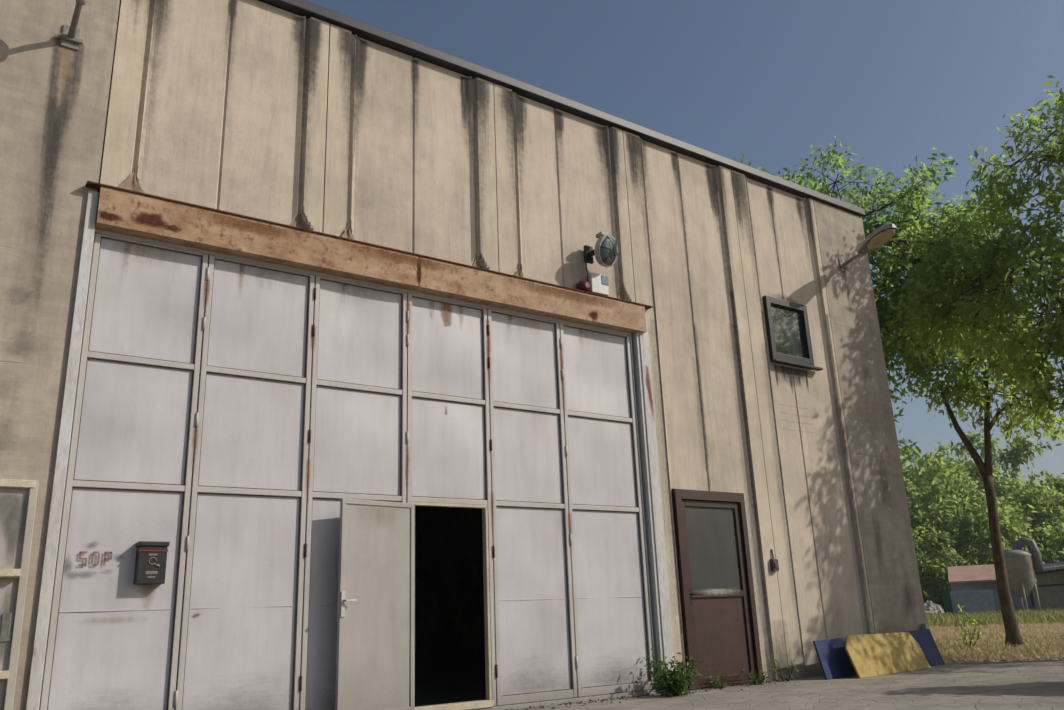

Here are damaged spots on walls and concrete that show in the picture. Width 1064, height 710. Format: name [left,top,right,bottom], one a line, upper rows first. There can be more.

damp [296,17,319,82]
damp [342,31,366,94]
damp [43,39,80,216]
damp [461,76,487,120]
damp [503,89,523,138]
damp [555,110,563,132]
damp [598,126,646,178]
rust [100,212,120,221]
rust [135,213,181,232]
damp [707,165,746,220]
rust [379,249,432,282]
rust [443,303,451,326]